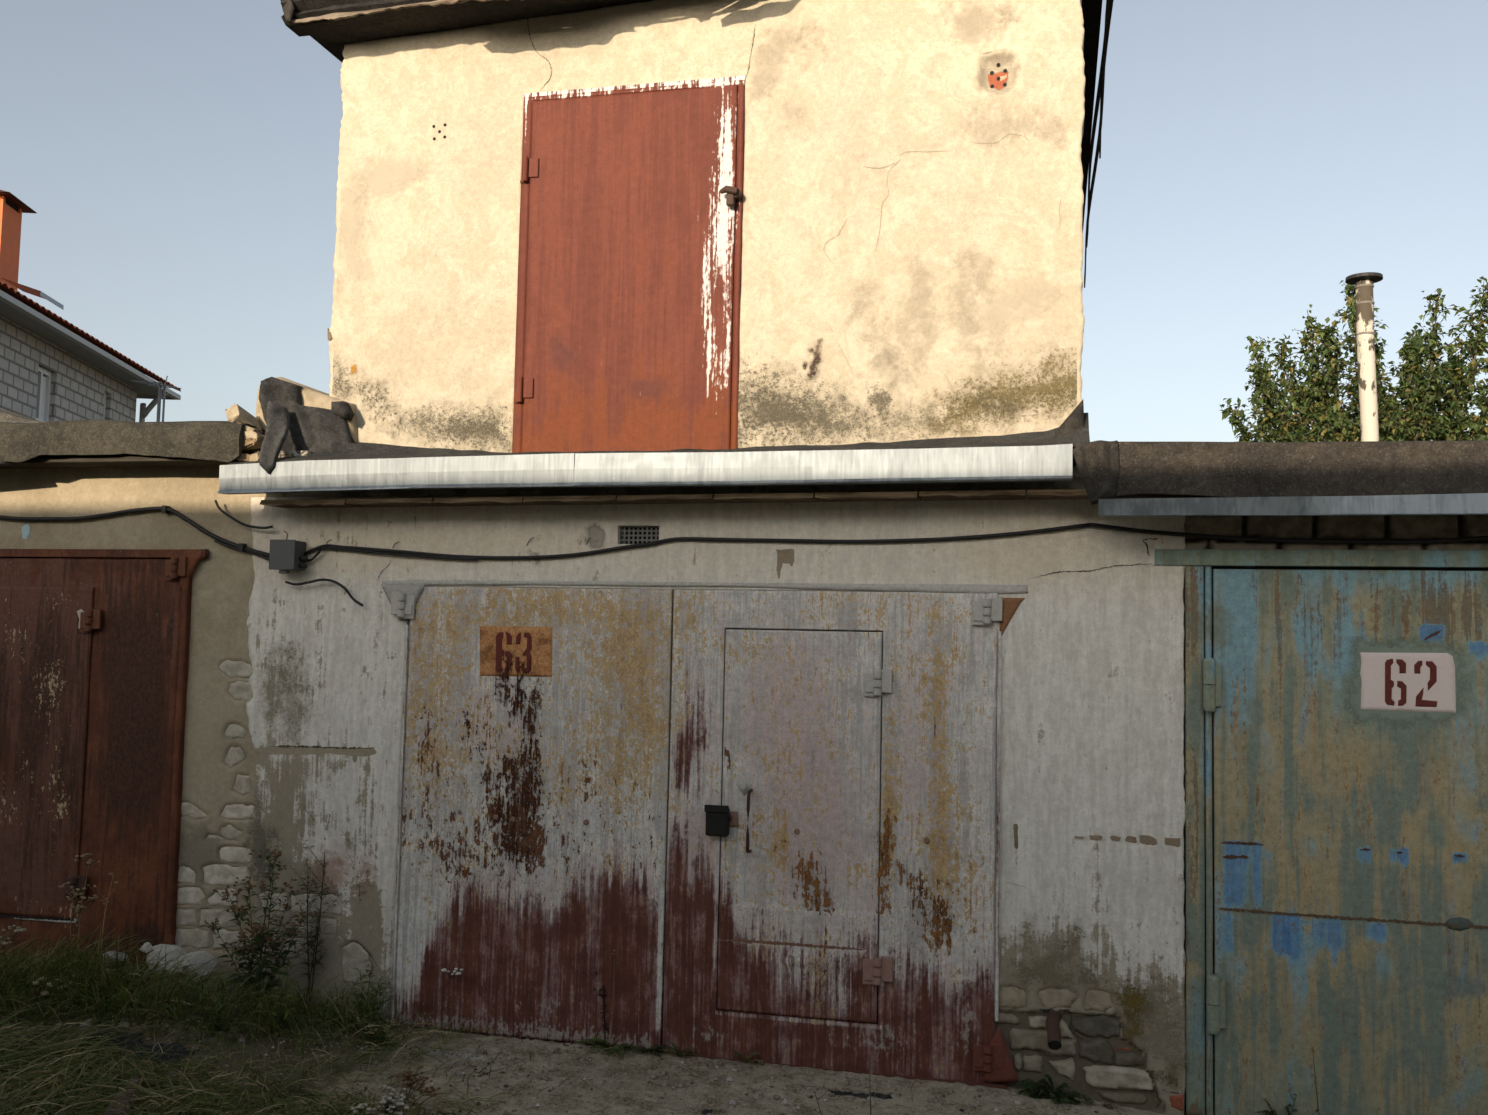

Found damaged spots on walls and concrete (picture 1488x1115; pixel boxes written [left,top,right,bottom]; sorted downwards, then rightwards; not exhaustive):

water stain [332,361,510,451]
water stain [730,340,892,446]
corrosion [456,652,549,871]
peeling [175,723,377,984]
corrosion [790,850,838,912]
corrosion [872,807,962,958]
water stain [1015,921,1109,990]
spalling [994,987,1184,1114]